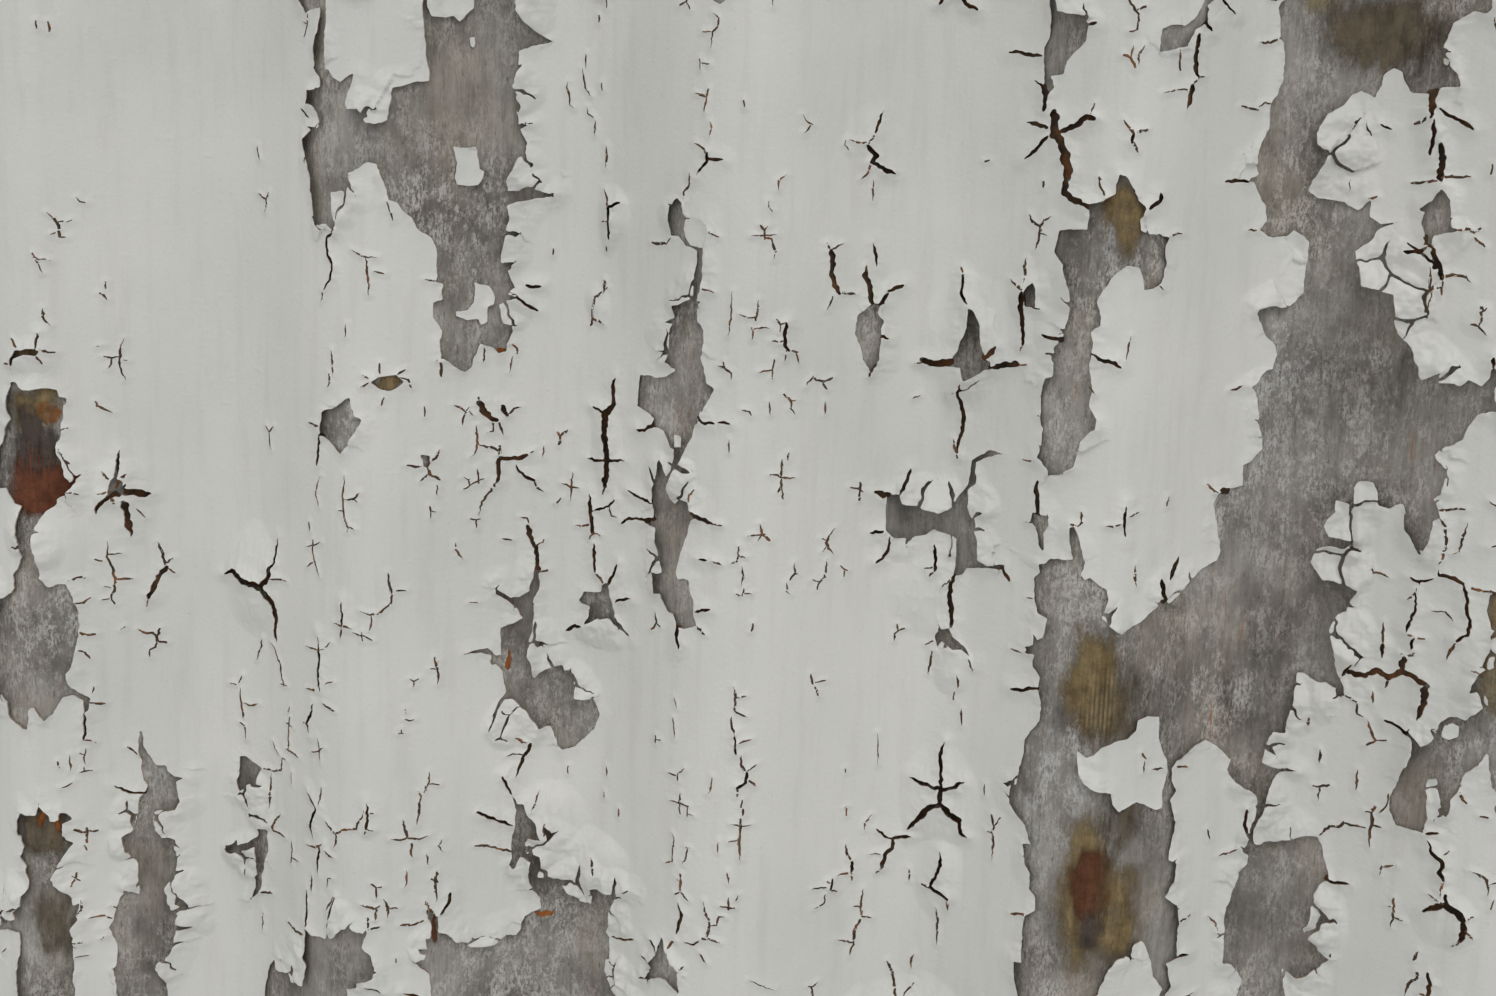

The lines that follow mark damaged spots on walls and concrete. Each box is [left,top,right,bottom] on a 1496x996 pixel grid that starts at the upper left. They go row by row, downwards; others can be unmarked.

rust [13,388,81,516]
peeling [0,335,143,743]
peeling [0,725,211,996]
crack [226,477,443,920]
peeling [294,0,567,379]
crack [424,357,660,630]
peeling [400,766,687,996]
crack [812,675,1001,969]
crack [913,81,1149,459]
rust [1056,817,1111,971]
peeling [870,0,1496,996]
crack [1306,501,1496,996]